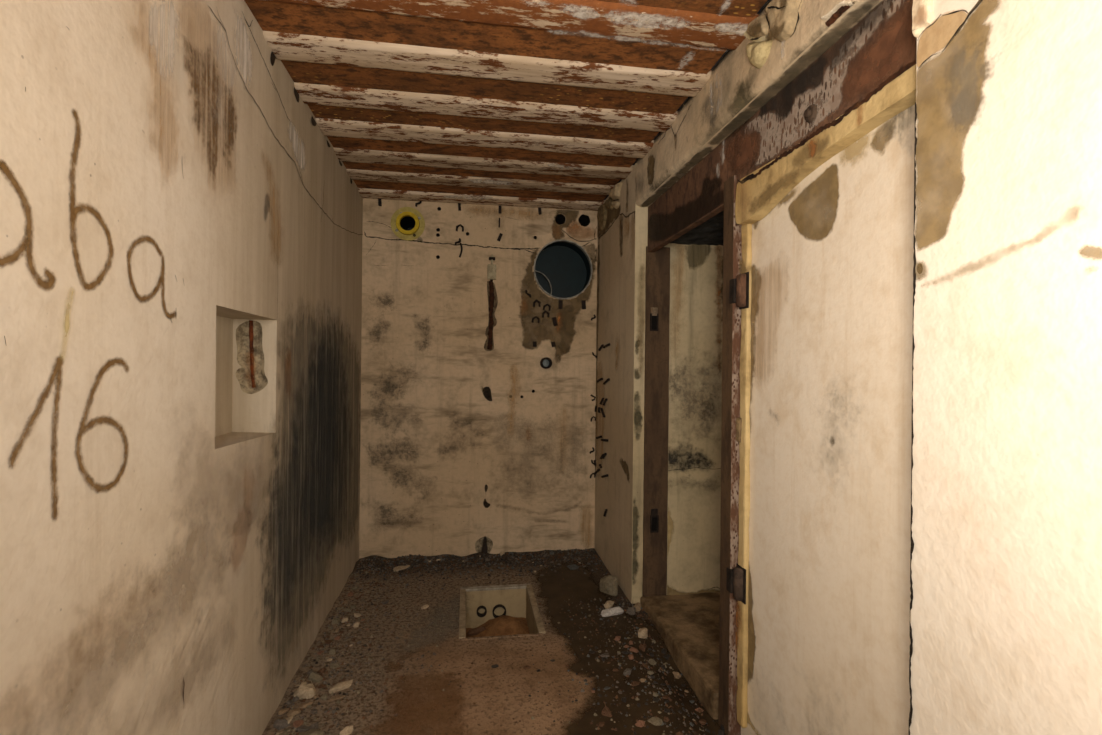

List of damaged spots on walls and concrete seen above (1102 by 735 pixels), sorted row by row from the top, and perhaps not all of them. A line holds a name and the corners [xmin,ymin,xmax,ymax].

peeling [744,0,967,164]
leakage [751,0,999,249]
leakage [265,314,416,674]